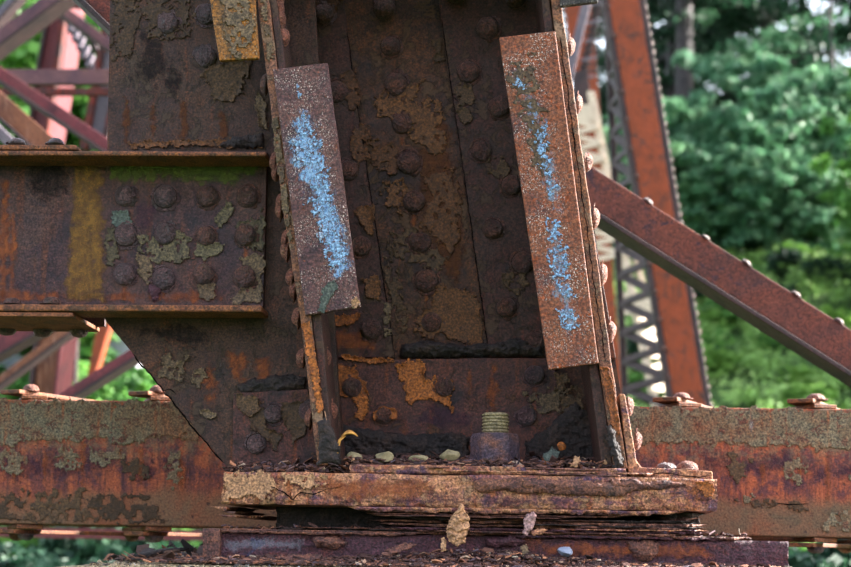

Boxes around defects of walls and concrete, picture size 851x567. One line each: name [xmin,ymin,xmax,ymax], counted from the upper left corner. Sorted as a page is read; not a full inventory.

rust [0,166,132,303]
peeling [135,228,225,285]
peeling [214,200,267,305]
peeling [350,123,463,274]
peeling [335,274,392,338]
peeling [413,282,484,346]
peeling [0,487,165,526]
peeling [0,397,199,491]
peeling [301,321,324,413]
peeling [338,354,455,421]
peeling [221,451,613,503]
peeling [599,366,851,486]